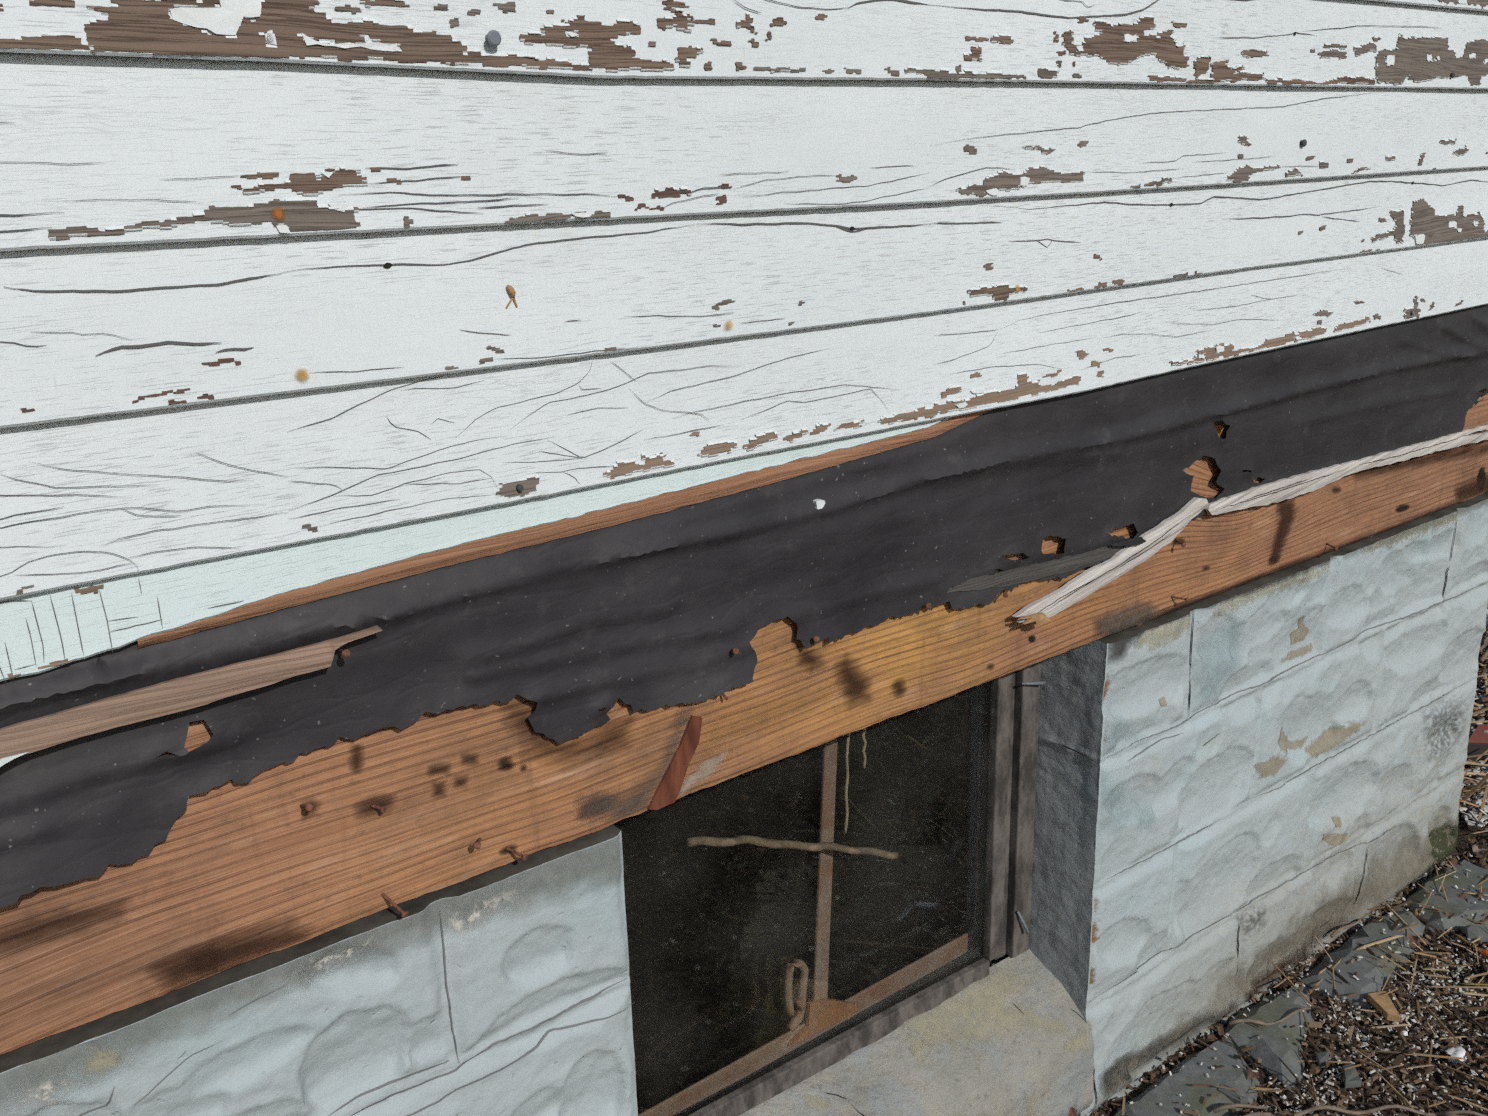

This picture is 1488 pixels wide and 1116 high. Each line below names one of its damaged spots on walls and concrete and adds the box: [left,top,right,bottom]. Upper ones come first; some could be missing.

peeling [0,0,862,74]
peeling [884,15,1488,86]
peeling [47,166,402,240]
peeling [1361,198,1488,252]
peeling [963,263,1028,305]
peeling [1170,300,1381,366]
peeling [690,348,1114,457]
crack [0,313,899,682]
peeling [603,452,675,479]
water stain [0,911,101,943]
water stain [157,931,300,983]
water stain [314,948,356,969]